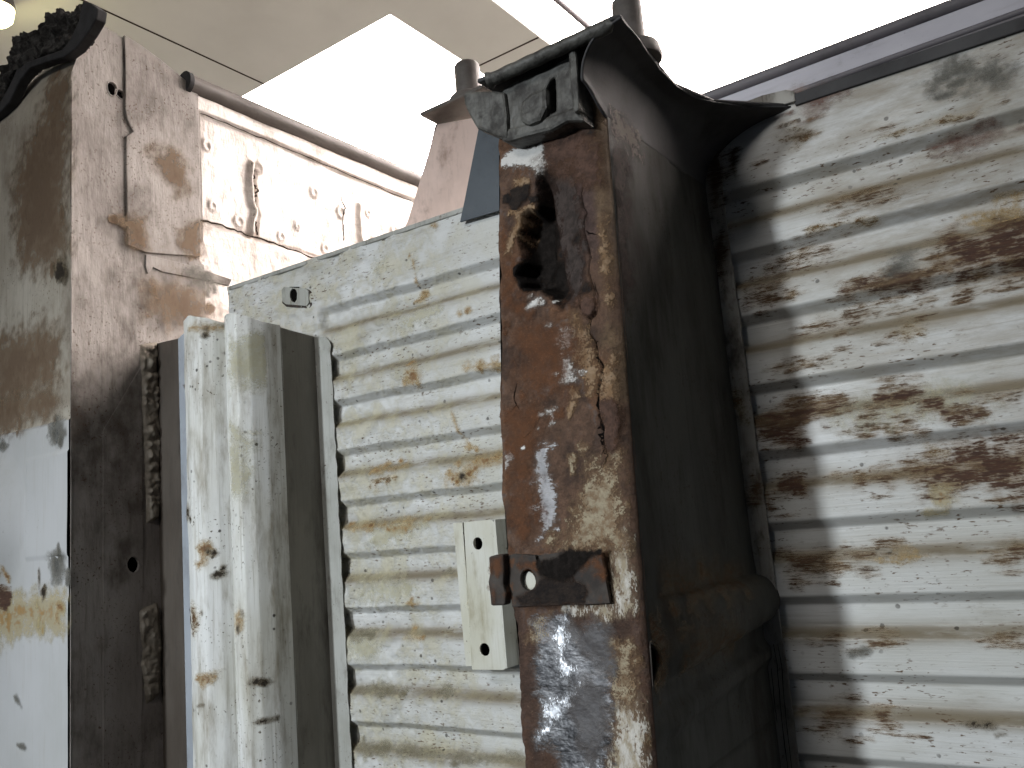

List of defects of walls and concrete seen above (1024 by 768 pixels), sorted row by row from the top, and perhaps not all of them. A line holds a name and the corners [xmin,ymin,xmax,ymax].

leakage [10,69,75,279]
leakage [146,144,191,197]
corrosion [543,129,606,191]
peeling [512,262,547,292]
crack [574,184,608,467]
corrosion [738,185,898,316]
corrosion [772,215,1024,374]
corrosion [446,203,626,596]
corrosion [754,374,1024,517]
corrosion [0,567,12,611]
corrosion [195,540,217,567]
corrosion [772,537,906,589]